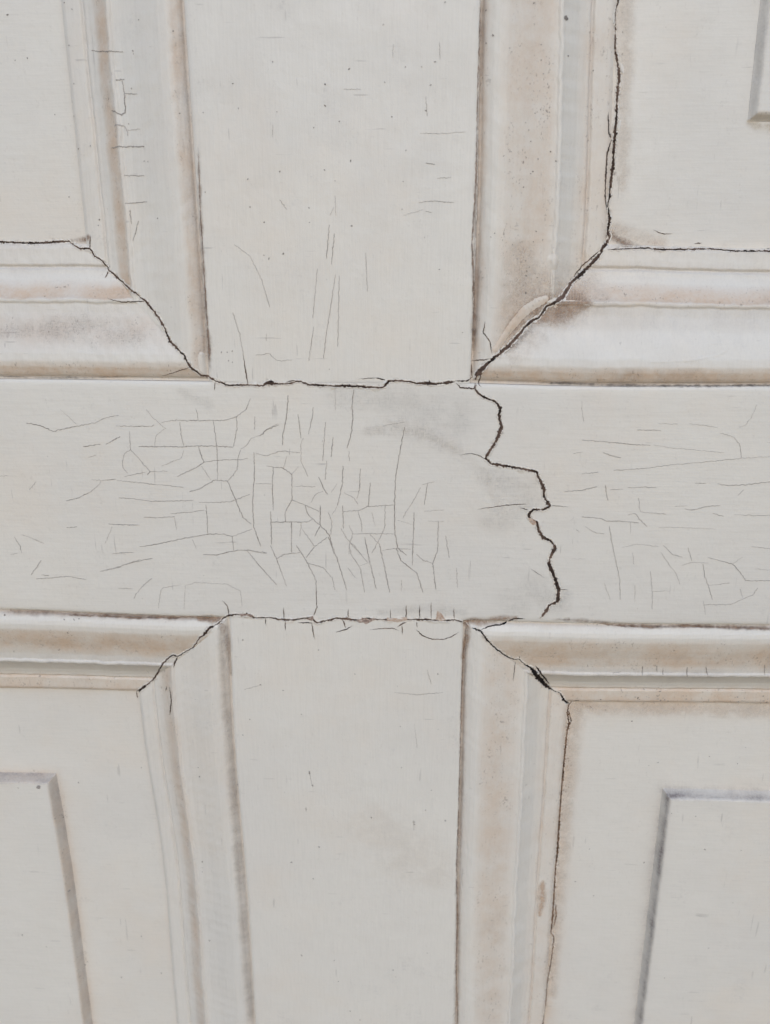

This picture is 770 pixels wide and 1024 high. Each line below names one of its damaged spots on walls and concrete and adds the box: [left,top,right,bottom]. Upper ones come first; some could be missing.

crack [0,0,770,619]
crack [66,397,578,1024]